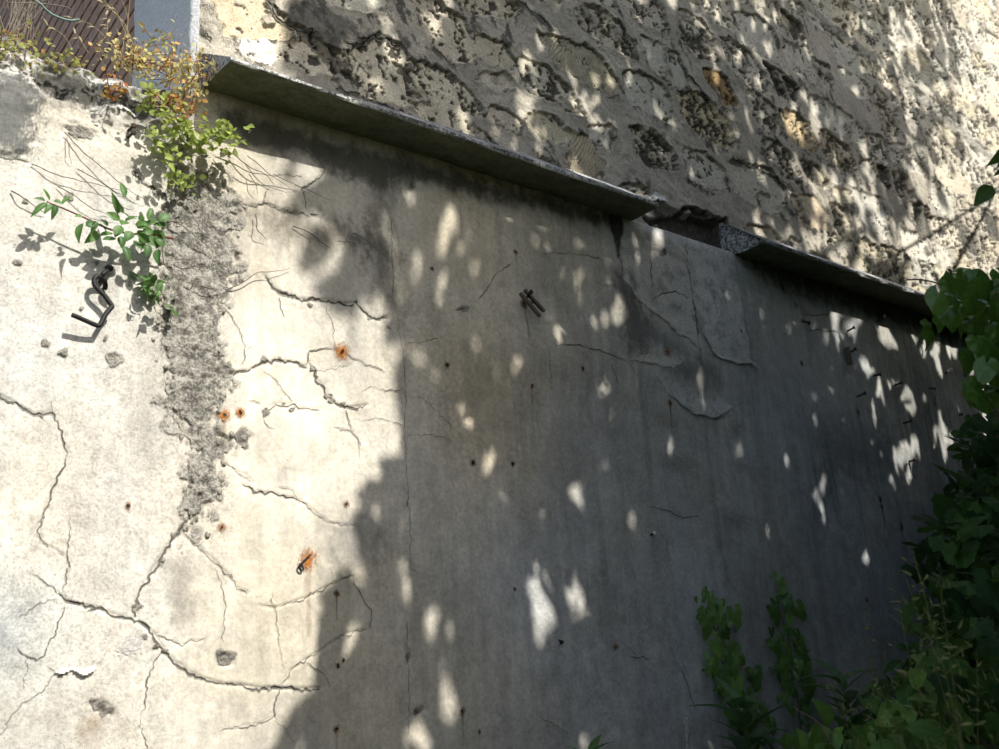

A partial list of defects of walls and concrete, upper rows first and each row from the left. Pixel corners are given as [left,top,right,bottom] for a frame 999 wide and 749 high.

leakage [225,111,623,257]
spalling [150,155,252,552]
corrosion [217,407,245,421]
crack [223,217,452,573]
corrosion [334,341,349,360]
flaking render [630,346,732,418]
flaking render [619,237,758,368]
leakage [741,256,977,345]
crack [0,395,372,749]
corrosion [297,550,317,571]